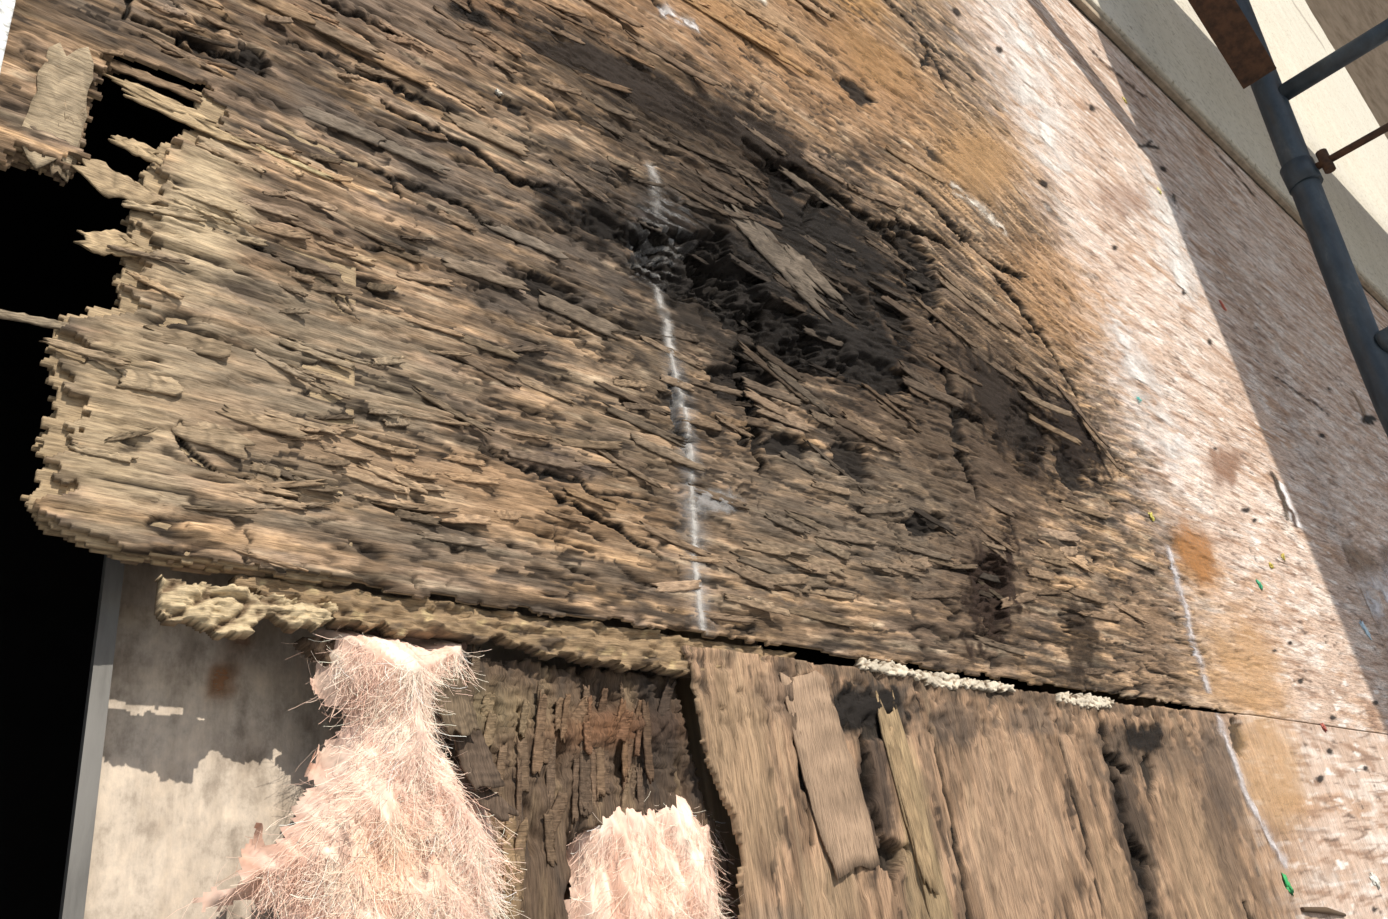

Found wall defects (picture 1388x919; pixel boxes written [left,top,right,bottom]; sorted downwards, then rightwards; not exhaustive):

crack [121,0,262,77]
crack [320,0,399,37]
crack [286,42,545,191]
water stain [448,0,927,397]
water stain [952,183,1004,228]
crack [937,364,975,491]
water stain [947,342,1111,491]
water stain [691,486,731,619]
corrosion [1176,525,1212,582]
spalling [228,548,880,908]